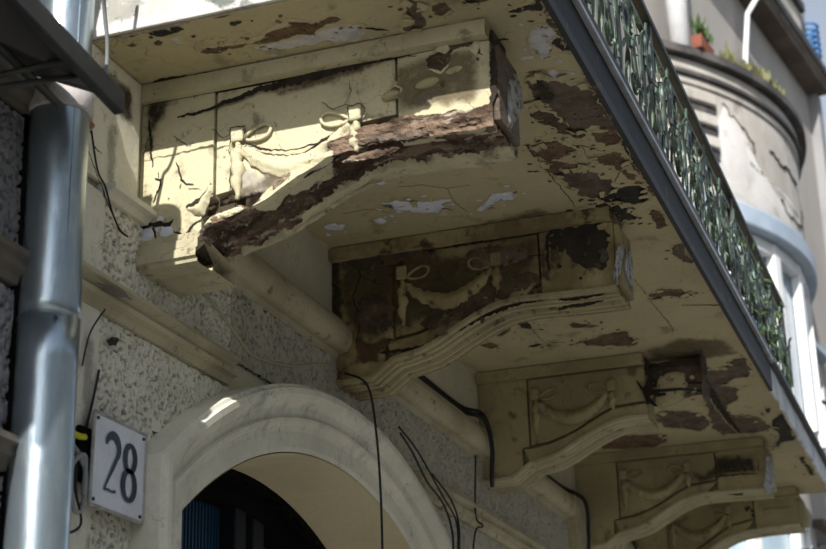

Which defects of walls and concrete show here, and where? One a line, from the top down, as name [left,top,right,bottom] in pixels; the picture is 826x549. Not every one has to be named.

spalling [125,26,184,48]
water stain [395,52,475,106]
crack [88,55,415,239]
spalling [194,0,669,262]
spalling [545,221,633,287]
spalling [664,243,694,264]
spalling [406,270,541,331]
spalling [644,287,704,301]
spalling [480,322,543,350]
spalling [565,321,643,349]
spalling [601,355,796,494]